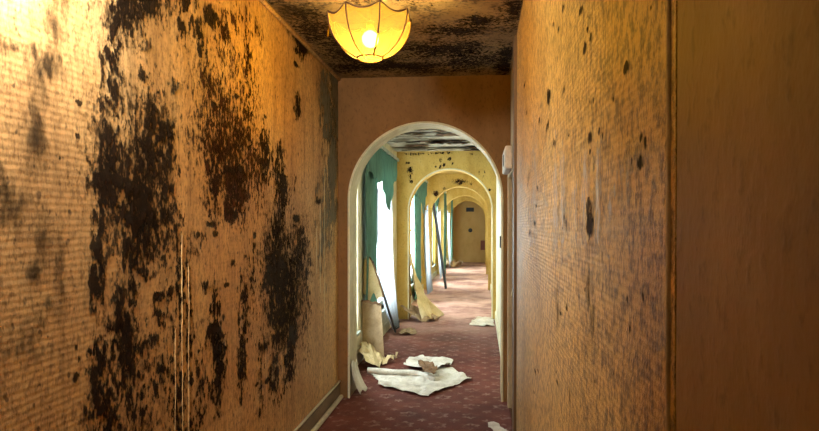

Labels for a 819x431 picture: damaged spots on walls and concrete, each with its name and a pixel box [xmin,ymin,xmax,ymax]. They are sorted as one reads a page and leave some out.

leakage [73,0,523,431]
peeling [410,254,444,318]
leakage [527,117,615,260]
leakage [631,133,647,170]